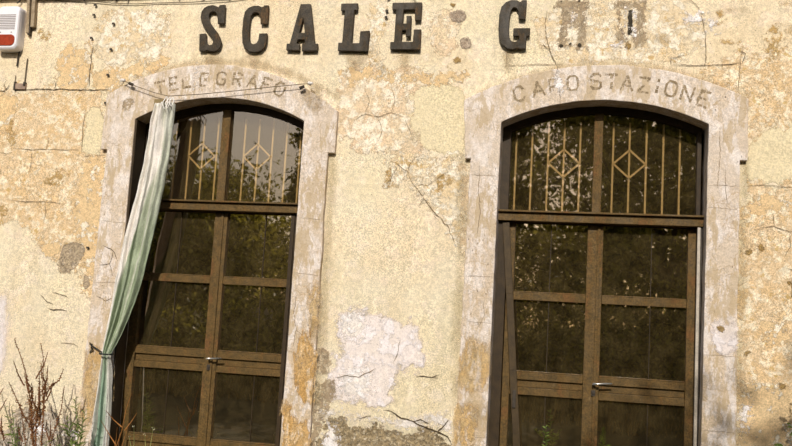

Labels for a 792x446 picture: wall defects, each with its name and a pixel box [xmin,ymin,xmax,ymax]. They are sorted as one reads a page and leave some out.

peeling [0,1,171,299]
peeling [336,1,471,256]
crack [357,91,454,240]
peeling [699,45,792,142]
flaking render [327,306,425,408]
flaking render [316,416,454,446]
crack [387,410,451,442]